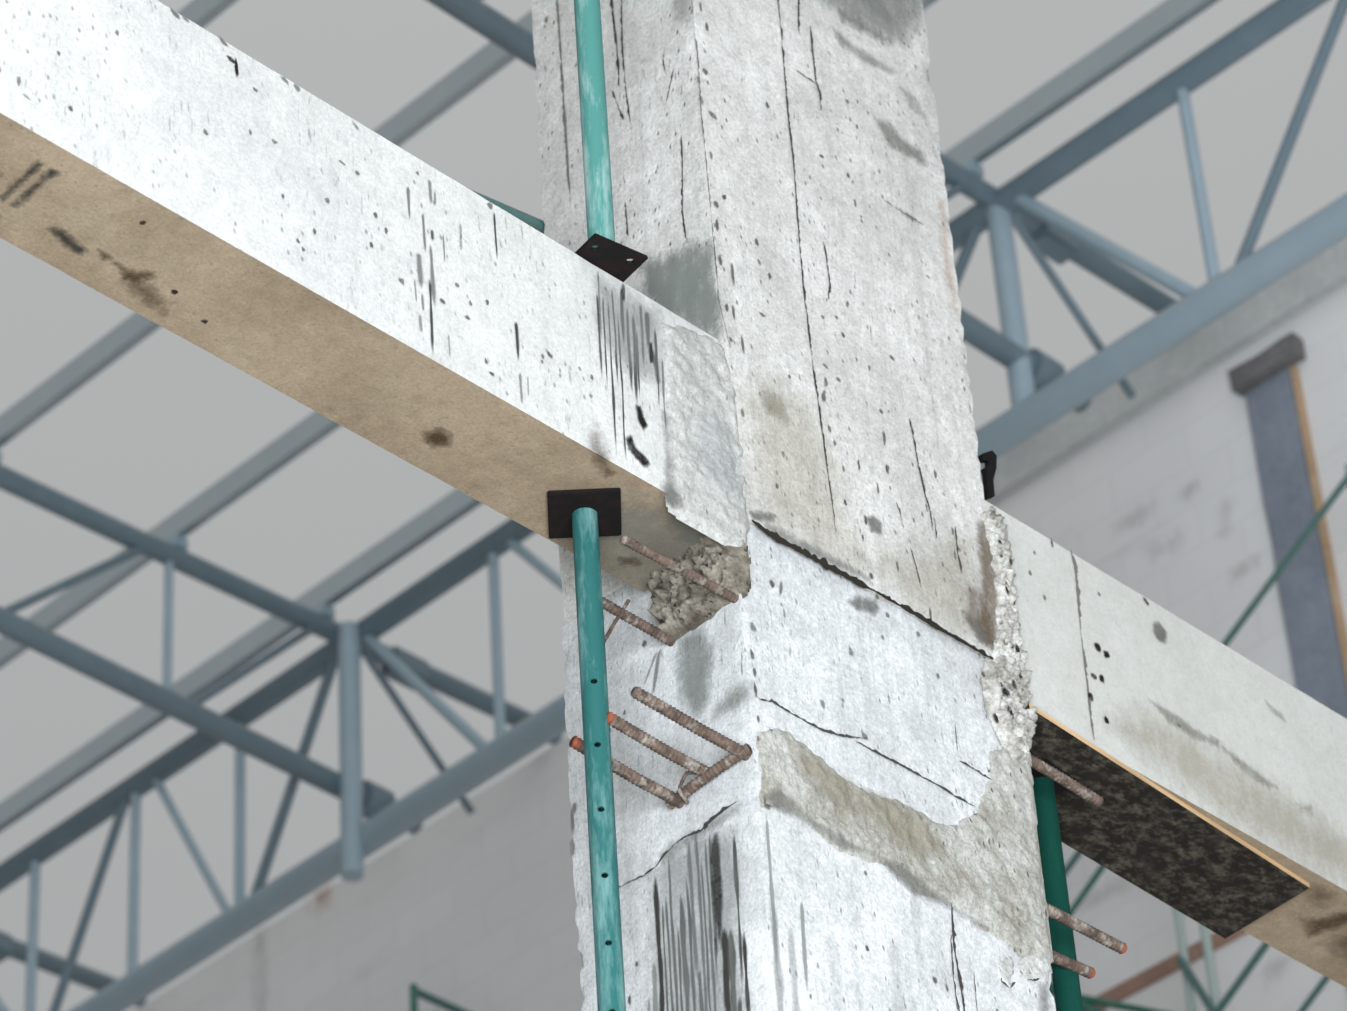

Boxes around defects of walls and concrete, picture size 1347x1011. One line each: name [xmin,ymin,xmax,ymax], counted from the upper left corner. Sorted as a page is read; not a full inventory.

water stain [2,163,57,204]
water stain [52,230,83,253]
water stain [121,269,152,297]
water stain [597,246,721,452]
crack [752,0,994,660]
spalling [602,535,751,647]
crack [757,696,991,807]
crack [619,801,737,887]
water stain [648,835,750,1011]
water stain [766,822,777,963]